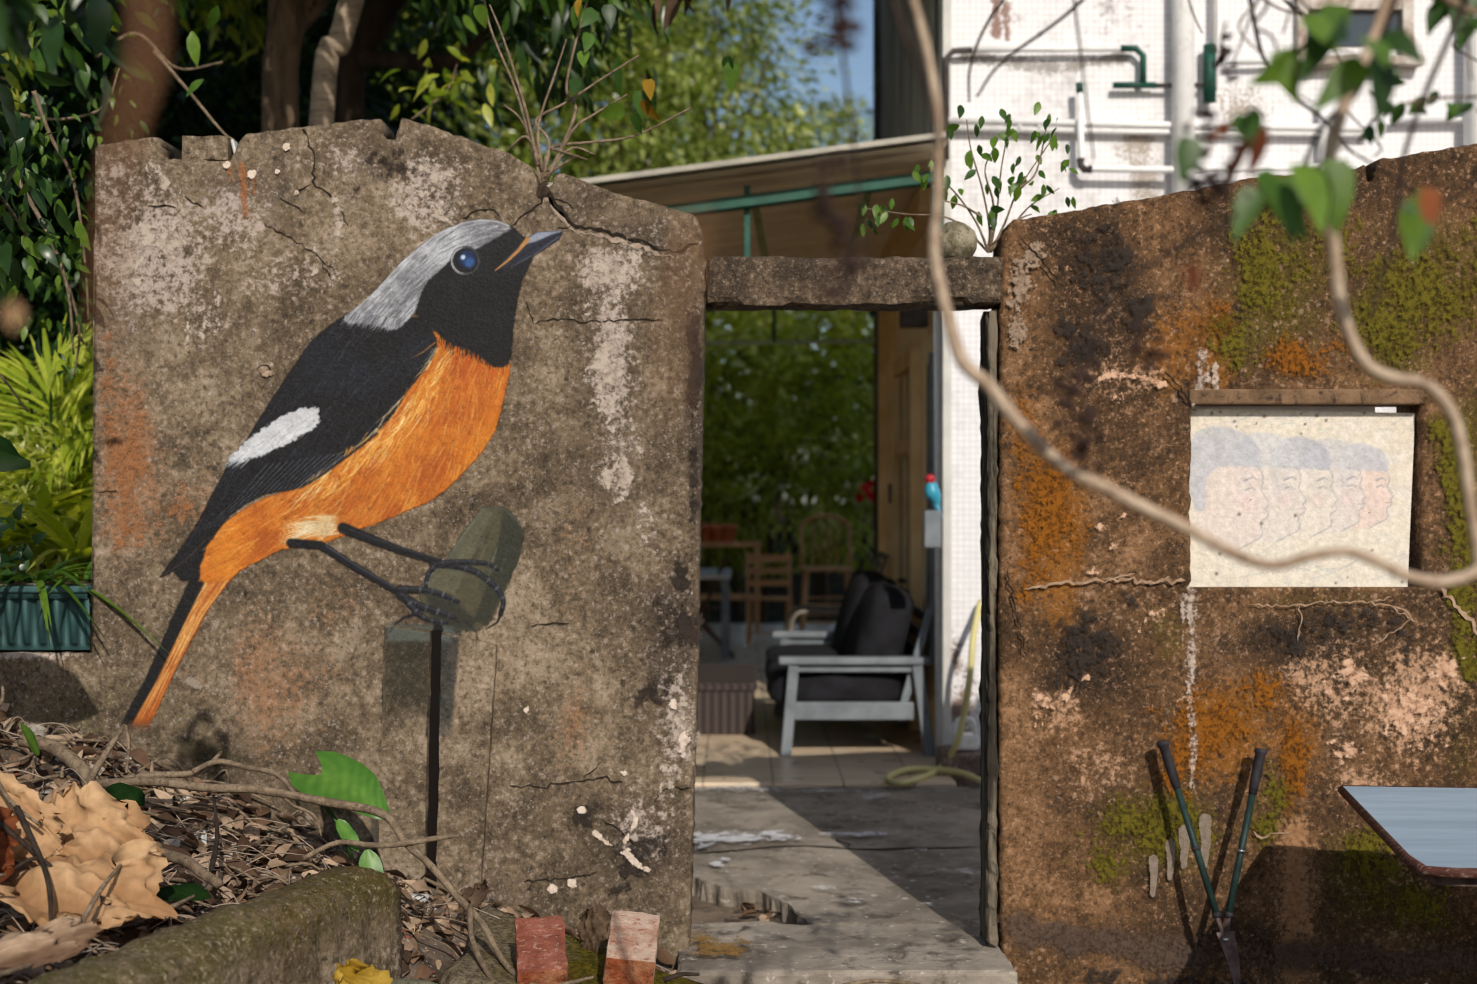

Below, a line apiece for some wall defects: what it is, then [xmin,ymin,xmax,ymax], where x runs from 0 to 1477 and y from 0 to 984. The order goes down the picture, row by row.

crack [264,129,349,277]
crack [463,191,699,258]
corrosion [1002,386,1092,611]
crack [1006,567,1186,657]
crack [1251,596,1416,643]
crack [1441,588,1477,635]
leakage [1181,586,1198,786]
peeling [677,726,691,758]
corrosion [1145,667,1315,819]
spalling [592,810,651,873]
leakage [998,816,1477,984]